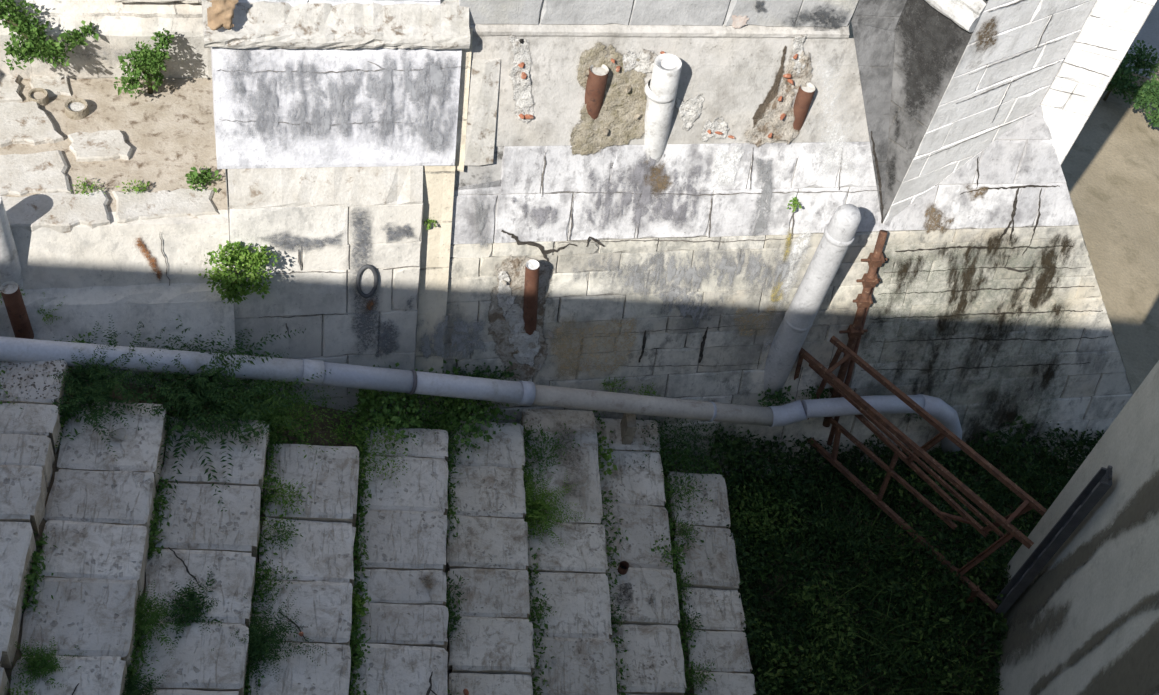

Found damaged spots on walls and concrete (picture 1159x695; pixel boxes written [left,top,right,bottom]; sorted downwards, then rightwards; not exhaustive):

water stain [230,49,456,153]
spalling [509,35,535,123]
spalling [570,42,665,155]
spalling [675,34,812,147]
water stain [264,233,341,252]
spalling [488,256,554,381]
crack [501,230,604,262]
water stain [585,146,744,229]
water stain [589,228,810,335]
water stain [912,233,1018,395]
water stain [959,235,1074,390]
crack [998,188,1042,272]